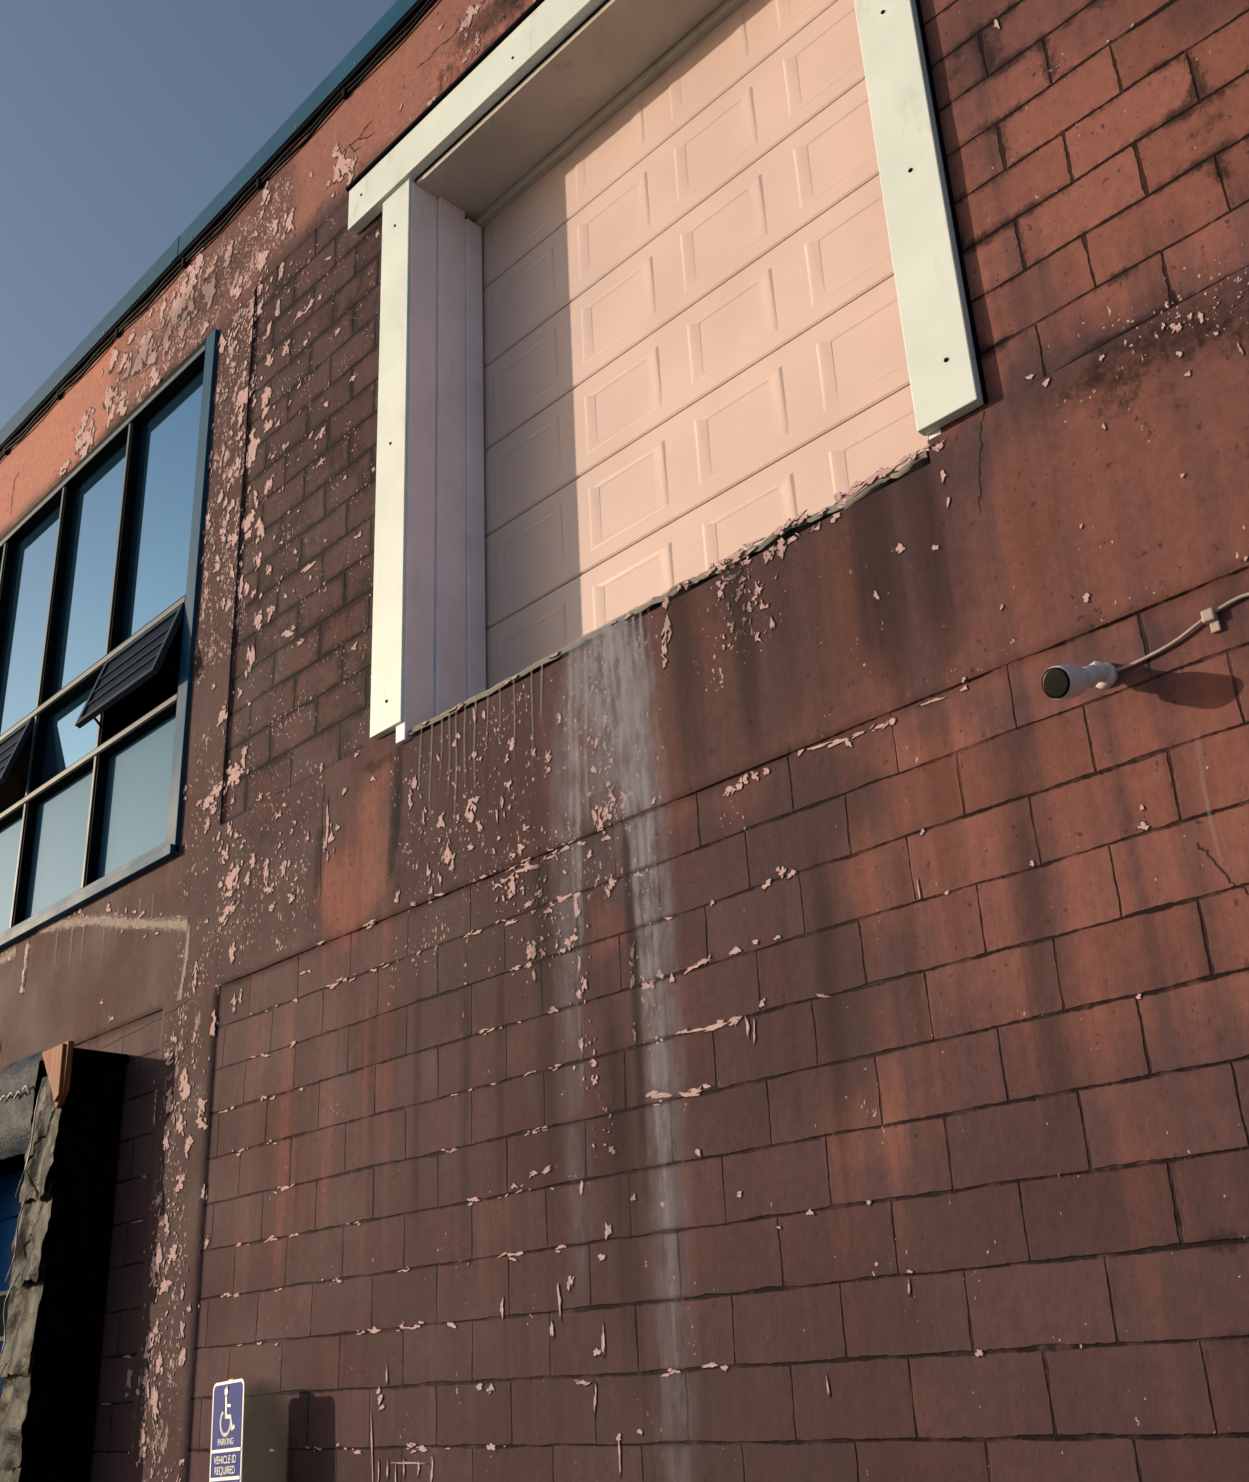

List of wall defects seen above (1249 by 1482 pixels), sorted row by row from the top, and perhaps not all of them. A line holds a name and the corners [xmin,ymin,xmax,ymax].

crack [417,0,486,68]
peeling [1161,282,1249,378]
peeling [58,180,331,736]
spalling [394,439,951,1155]
peeling [44,743,348,964]
peeling [498,1165,555,1199]
peeling [101,988,299,1482]
peeling [597,1222,612,1261]
spalling [356,1321,425,1335]
peeling [550,1275,574,1339]
peeling [592,1322,606,1359]
peeling [306,1365,451,1482]